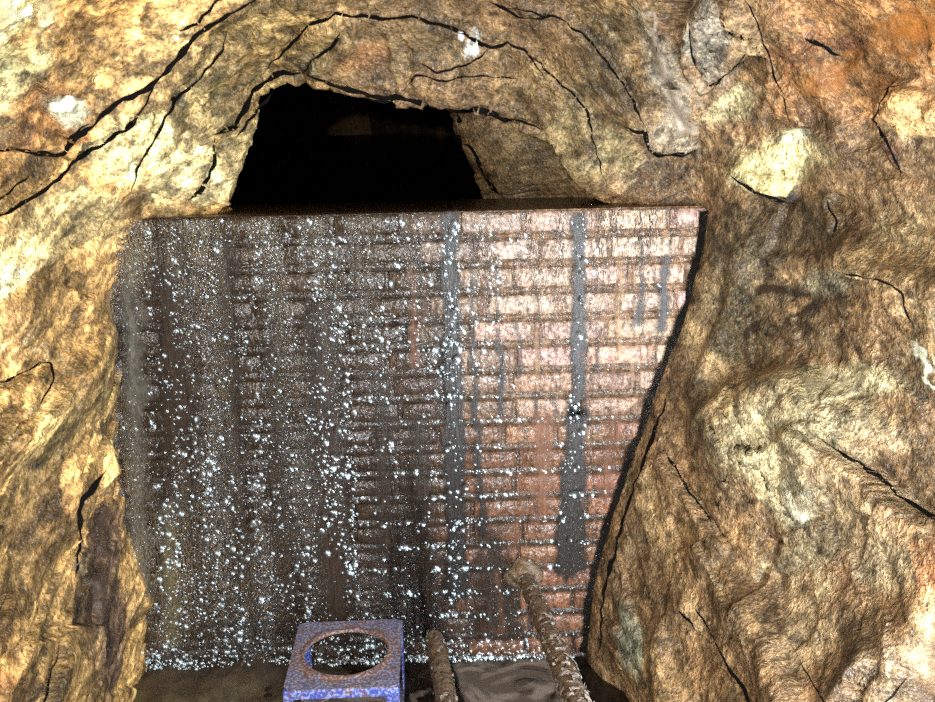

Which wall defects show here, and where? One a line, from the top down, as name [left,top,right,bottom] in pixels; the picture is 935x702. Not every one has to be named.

leakage [372,212,592,702]
leakage [553,214,599,578]
leakage [634,249,645,325]
leakage [658,256,670,333]